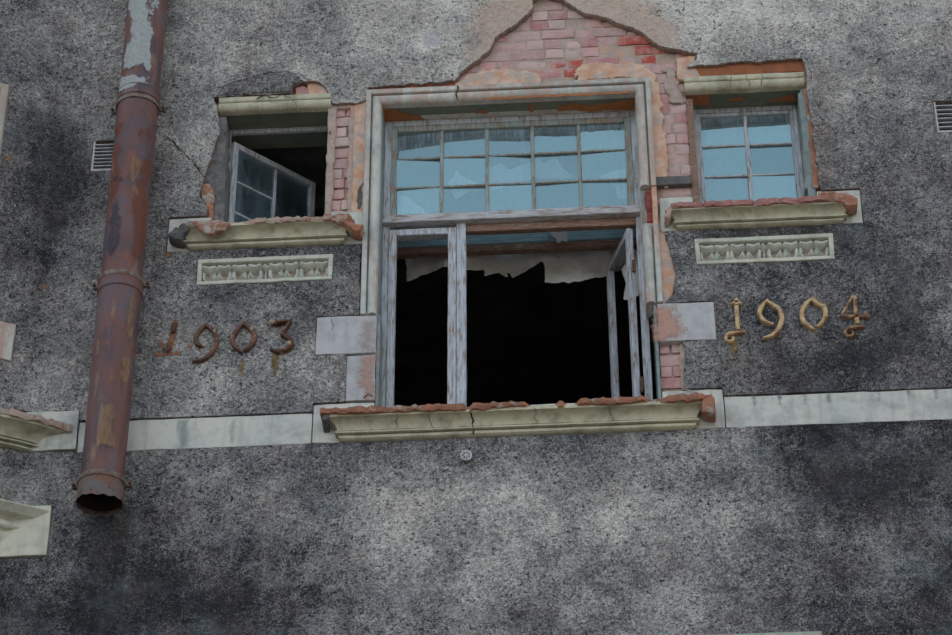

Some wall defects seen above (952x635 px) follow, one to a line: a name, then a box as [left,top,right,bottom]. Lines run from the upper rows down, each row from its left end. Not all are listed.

spalling [320,322,531,433]
flaking render [382,0,858,422]